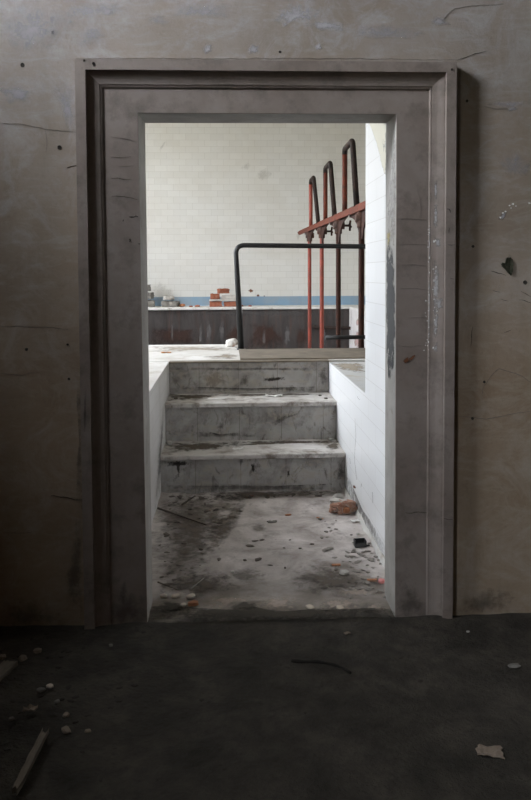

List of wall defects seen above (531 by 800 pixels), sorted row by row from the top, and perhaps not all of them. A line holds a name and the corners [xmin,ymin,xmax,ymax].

spalling [501,257,513,275]